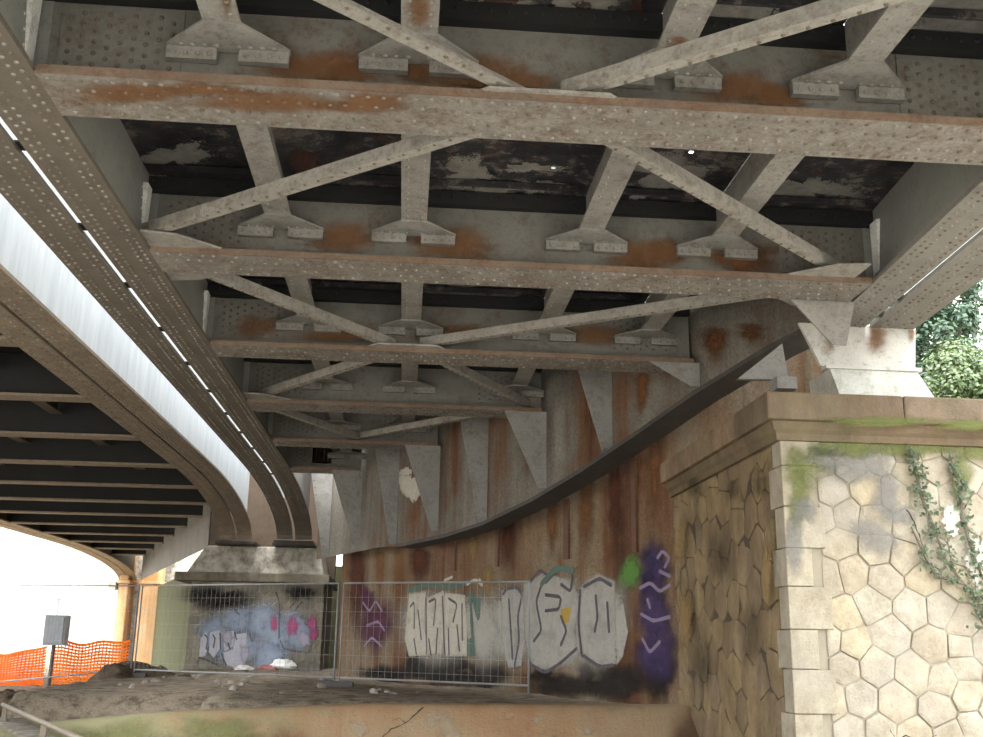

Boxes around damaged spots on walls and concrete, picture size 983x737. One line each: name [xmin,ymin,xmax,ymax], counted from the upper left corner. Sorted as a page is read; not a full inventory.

peeling [547,0,645,12]
rust [269,53,374,81]
rust [86,83,399,112]
peeling [443,152,570,195]
peeling [628,164,684,200]
peeling [656,149,720,182]
rust [415,230,484,259]
rust [614,241,684,268]
rust [710,246,775,272]
rust [870,328,884,348]
damp [811,451,911,522]
crack [382,707,424,737]